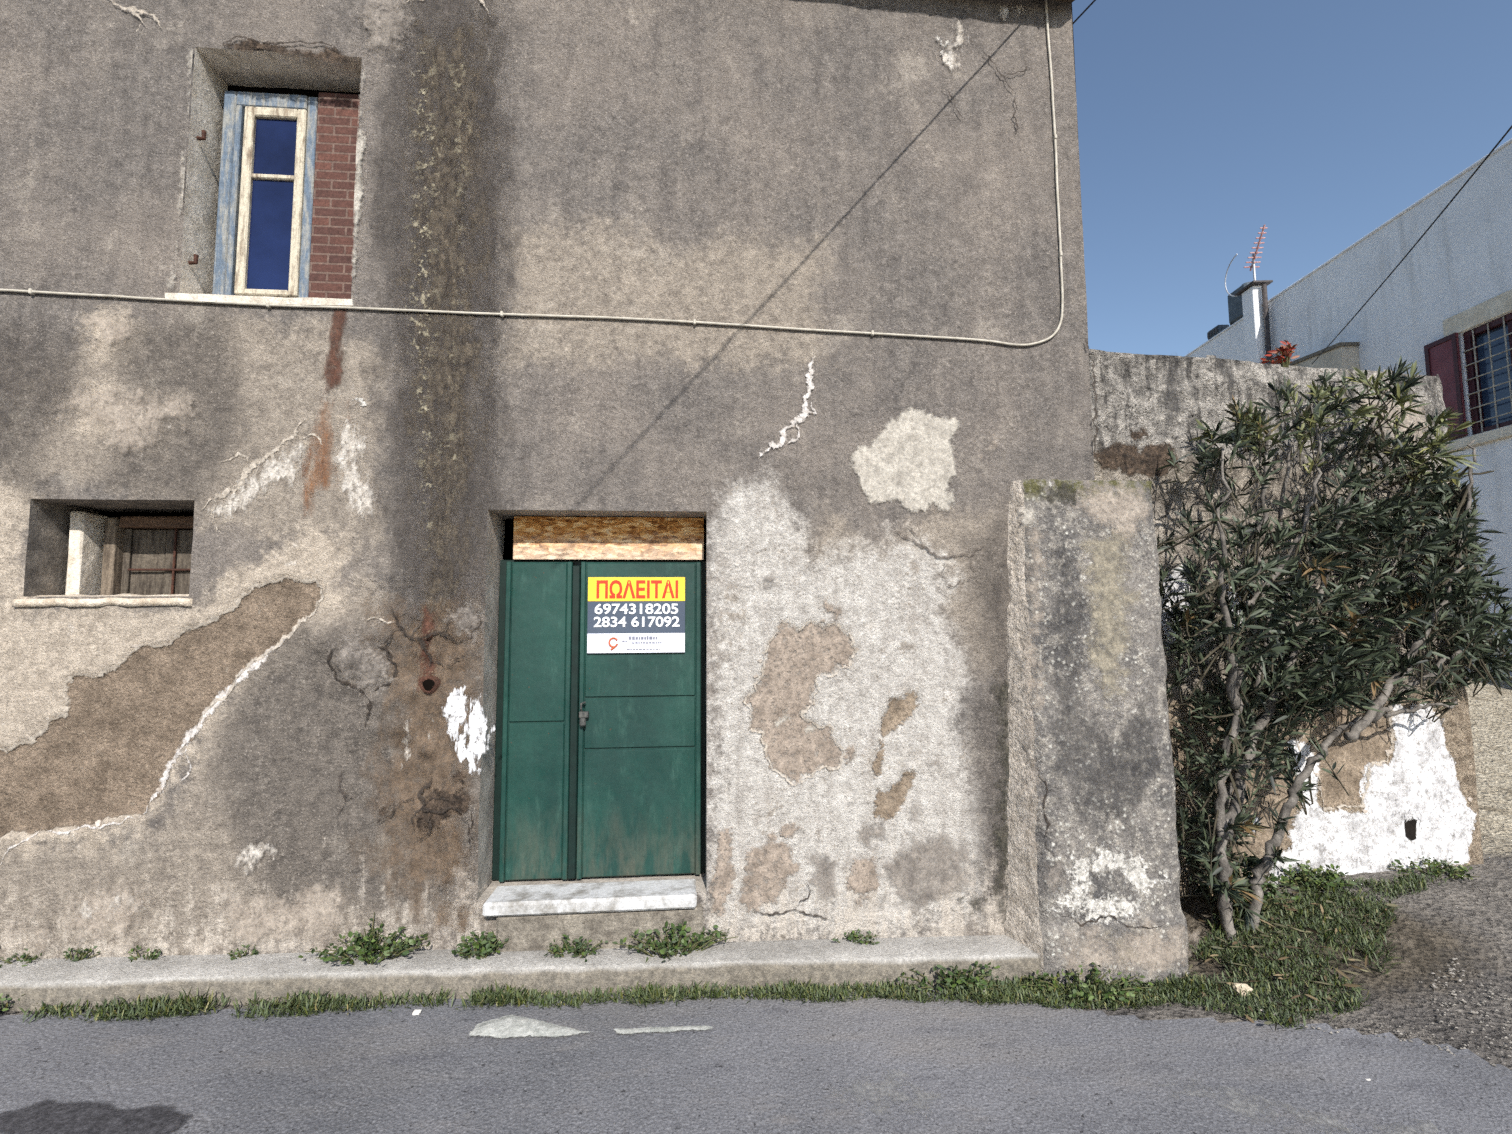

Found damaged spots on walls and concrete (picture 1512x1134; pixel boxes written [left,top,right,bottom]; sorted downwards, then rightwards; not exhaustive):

crack [113,3,163,31]
rust [324,310,345,388]
water stain [377,0,498,909]
crack [759,357,817,456]
peeling [1159,565,1193,649]
flaking render [0,576,324,837]
water stain [238,844,276,869]
water stain [224,886,343,942]
peeling [411,686,495,854]
flaking render [743,601,859,785]
flaking render [872,690,920,821]
peeling [1225,704,1477,885]